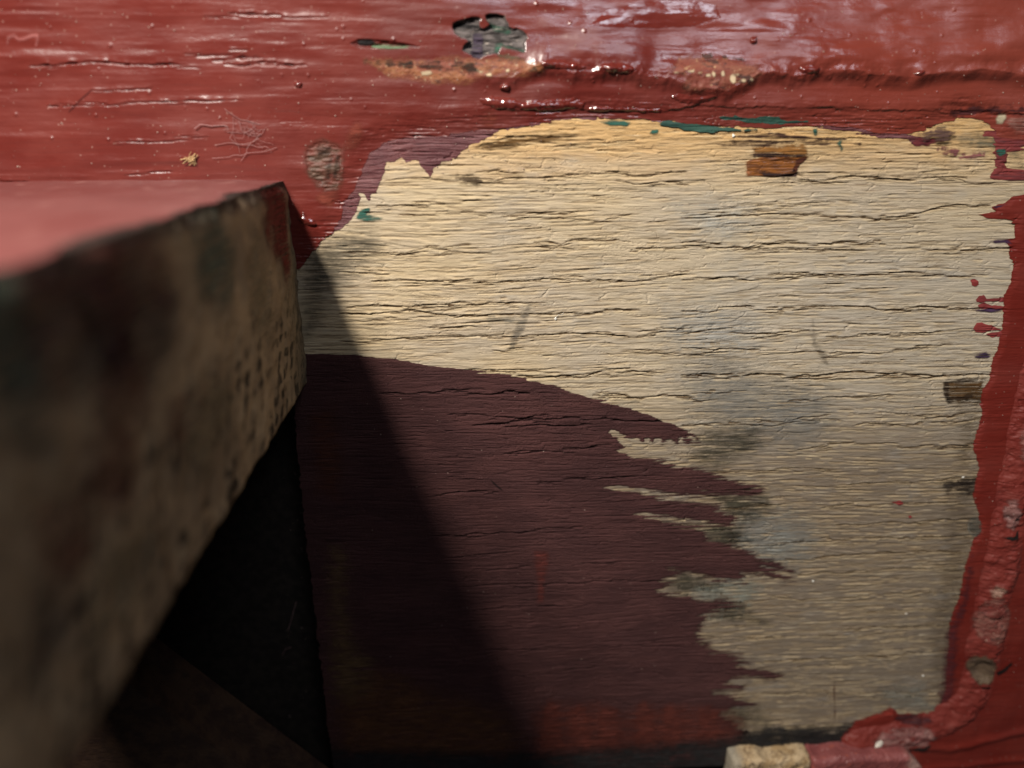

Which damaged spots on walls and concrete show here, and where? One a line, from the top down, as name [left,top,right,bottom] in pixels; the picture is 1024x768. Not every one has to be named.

peeling [350,13,543,84]
peeling [305,140,343,190]
crack [378,135,687,216]
peeling [746,144,807,177]
crack [339,174,999,663]
peeling [973,588,1010,645]
peeling [966,656,1012,689]
peeling [874,727,936,752]